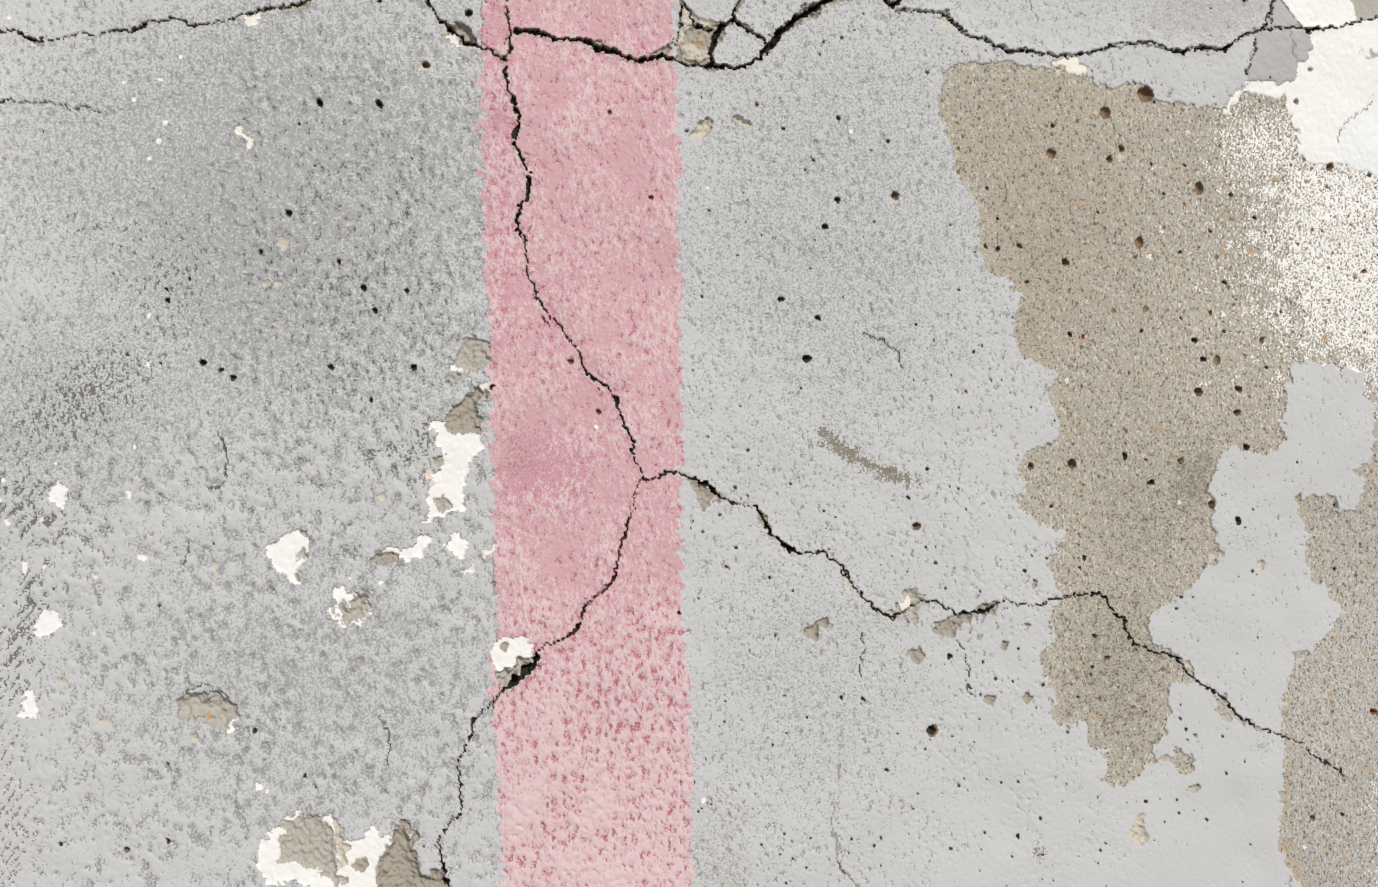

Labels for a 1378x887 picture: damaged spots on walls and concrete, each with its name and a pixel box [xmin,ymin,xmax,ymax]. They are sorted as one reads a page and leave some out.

crack [0,0,313,47]
crack [0,94,184,116]
crack [207,431,229,490]
crack [424,0,1378,887]
peeling [937,0,1378,887]
peeling [371,421,497,577]
crack [185,683,230,698]
peeling [490,636,542,689]
crack [332,715,391,766]
crack [233,764,250,841]
peeling [256,810,451,887]